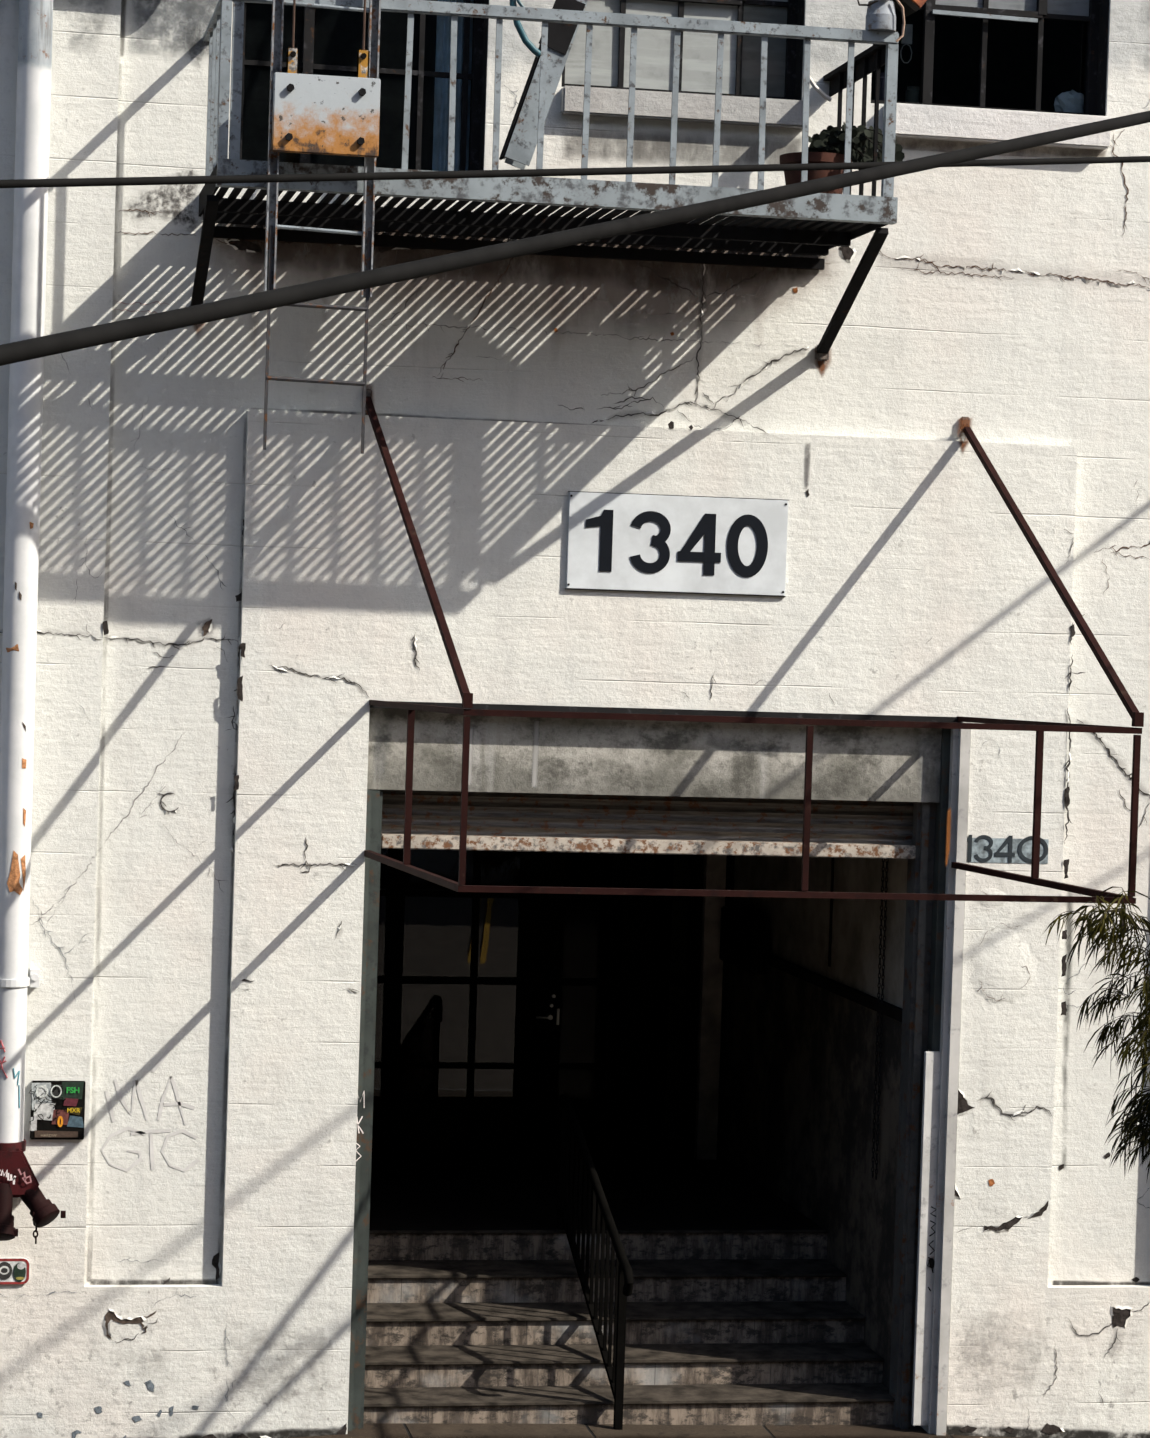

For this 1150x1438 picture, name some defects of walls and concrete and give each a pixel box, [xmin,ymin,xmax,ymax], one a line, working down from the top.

crack [116,209,360,248]
crack [369,238,810,434]
crack [879,251,1150,290]
crack [1110,103,1149,234]
crack [37,551,369,730]
crack [1064,529,1150,844]
crack [31,735,236,977]
crack [977,1091,1052,1121]
spalling [102,1308,158,1343]
spalling [1110,1305,1133,1328]